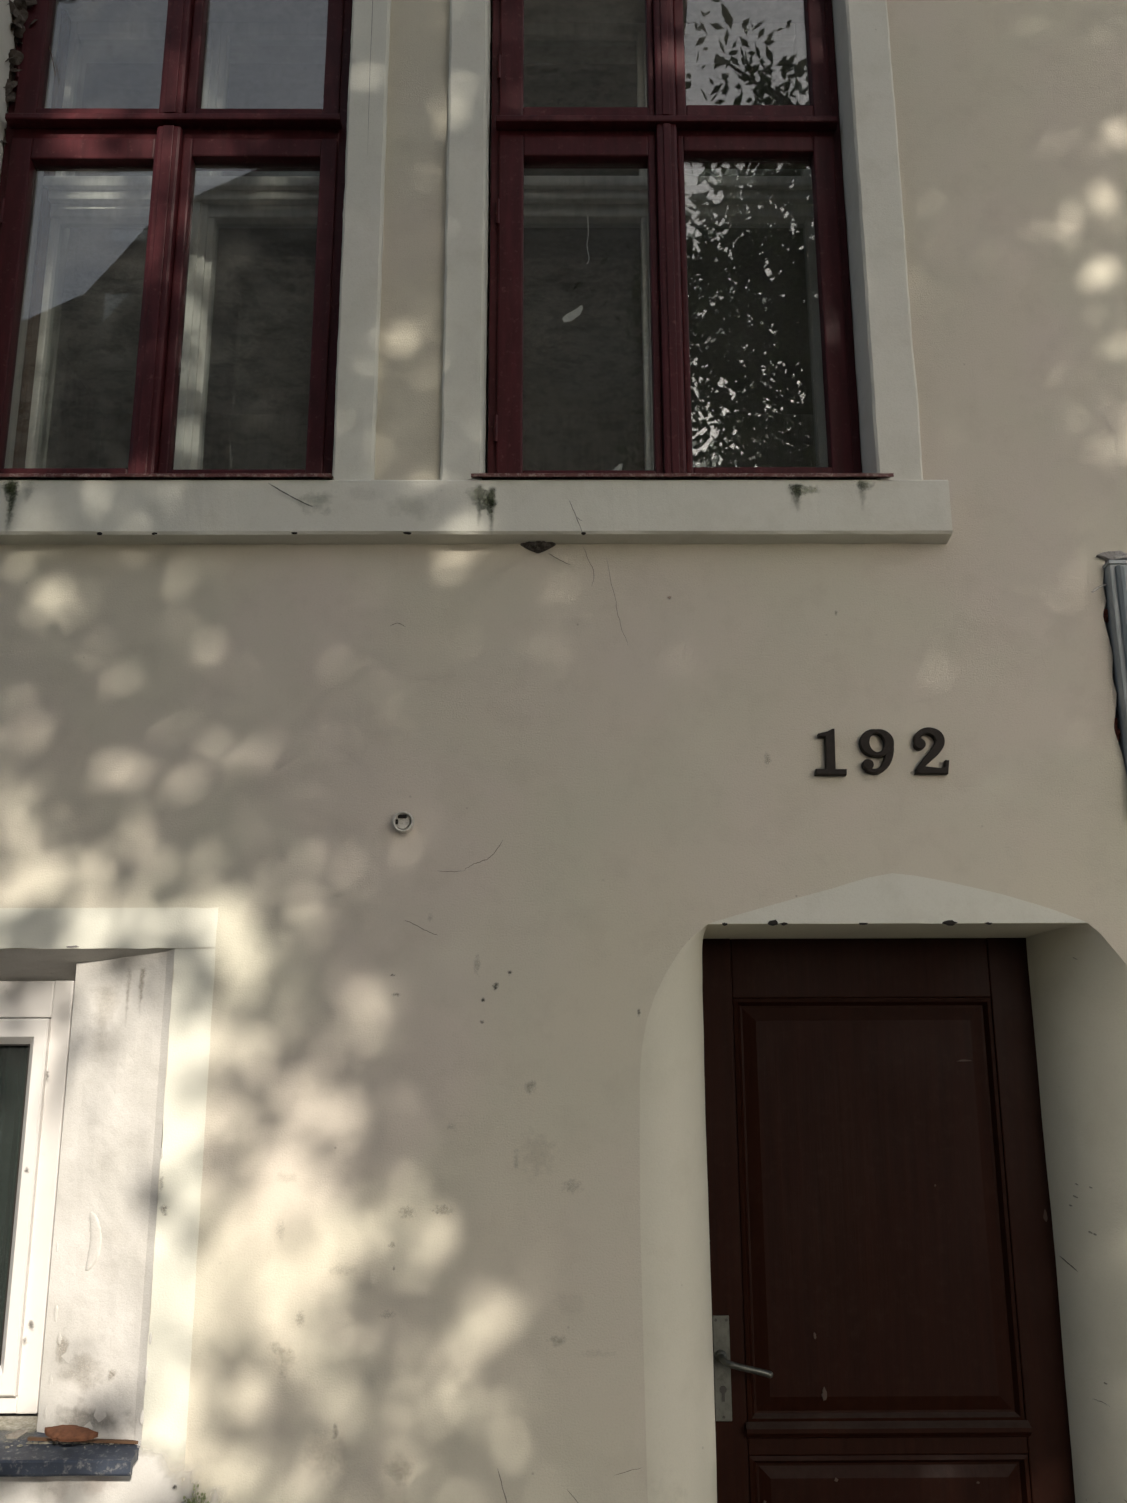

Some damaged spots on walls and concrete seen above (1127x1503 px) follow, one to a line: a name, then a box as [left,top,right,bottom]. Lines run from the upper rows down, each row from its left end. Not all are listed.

leakage [7,480,18,519]
leakage [475,485,495,518]
peeling [1096,551,1127,649]
spalling [1112,667,1127,775]